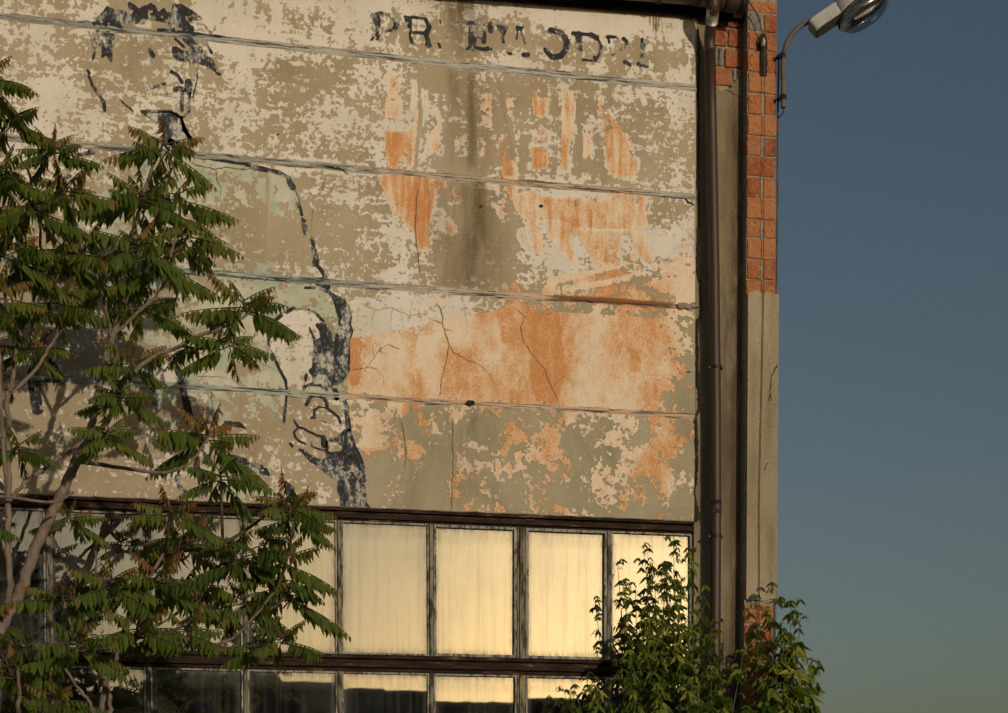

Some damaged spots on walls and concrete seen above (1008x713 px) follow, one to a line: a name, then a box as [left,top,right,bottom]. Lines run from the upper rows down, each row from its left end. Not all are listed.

flaking render [715,0,777,298]
peeling [0,0,696,520]
crack [359,302,495,394]
crack [517,307,573,398]
flaking render [739,605,773,712]